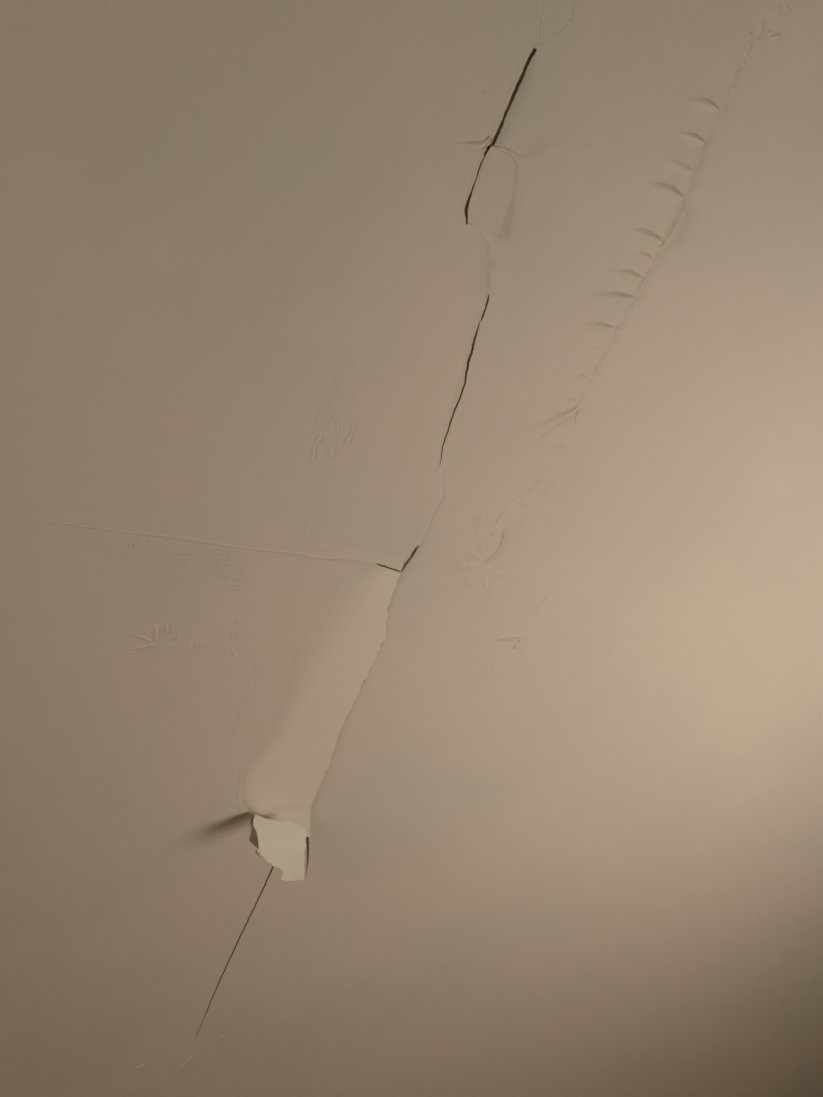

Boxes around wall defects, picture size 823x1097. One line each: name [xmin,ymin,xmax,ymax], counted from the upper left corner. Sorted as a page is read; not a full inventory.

peeling [467,145,522,238]
crack [312,41,537,573]
crack [196,866,274,1036]